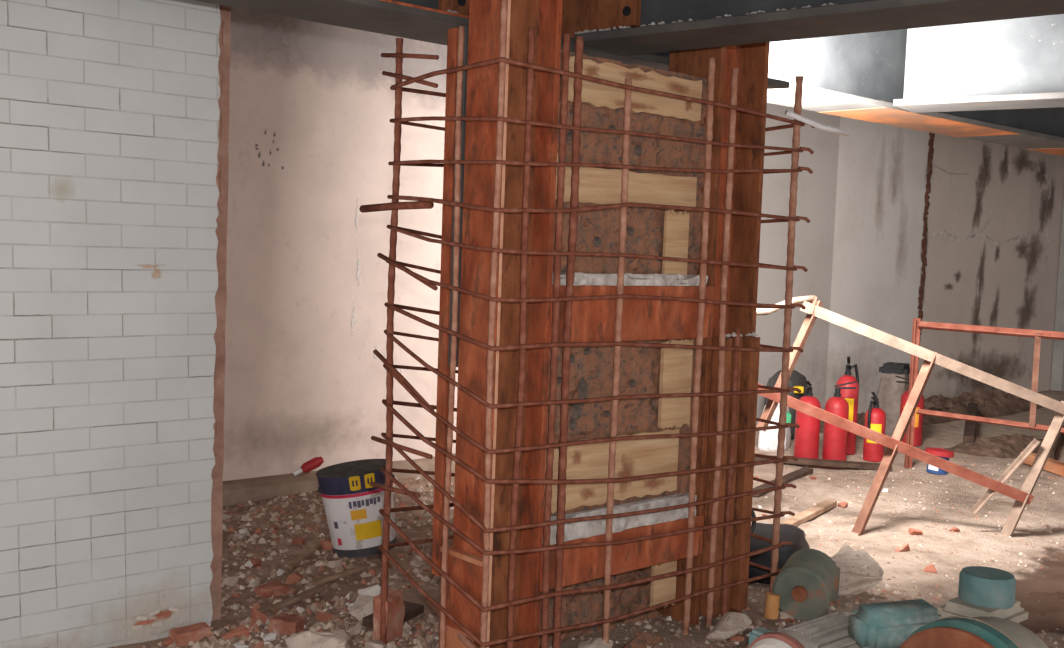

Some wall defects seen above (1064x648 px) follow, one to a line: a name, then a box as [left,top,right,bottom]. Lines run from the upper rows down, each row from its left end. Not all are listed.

damp [973,151,1054,226]
damp [1019,241,1038,274]
damp [973,247,999,343]
damp [1021,294,1033,329]
spalling [132,606,179,630]